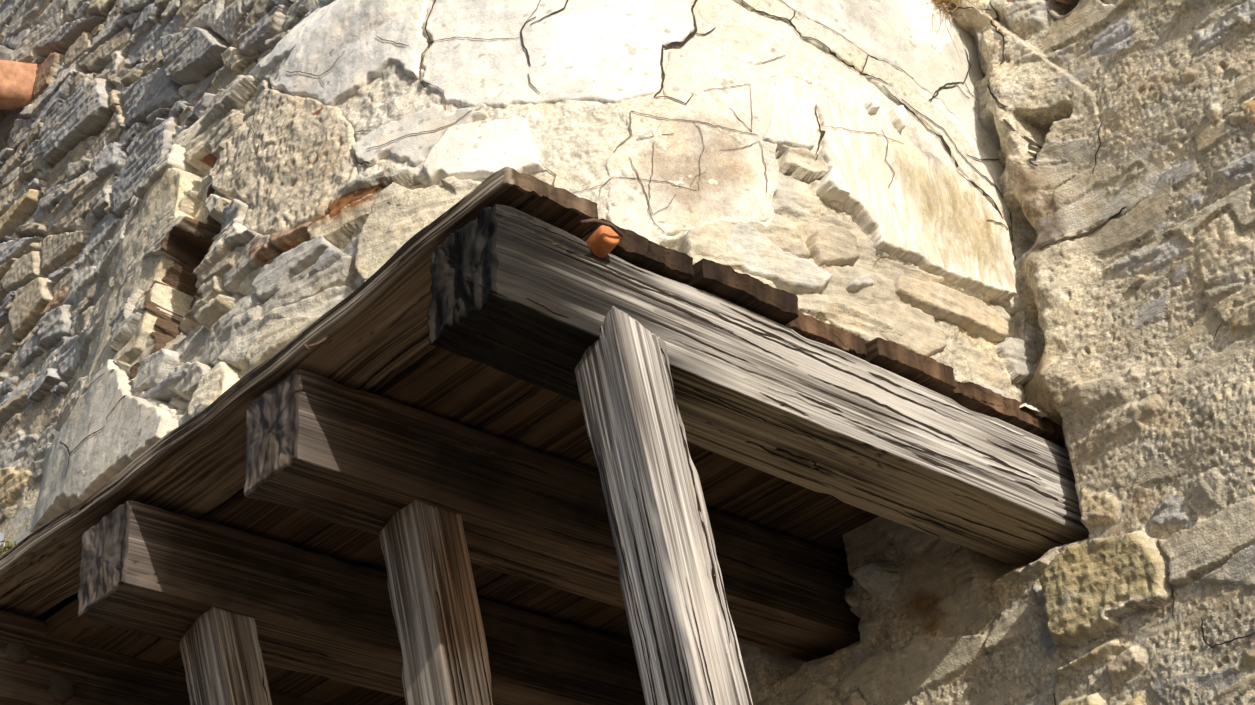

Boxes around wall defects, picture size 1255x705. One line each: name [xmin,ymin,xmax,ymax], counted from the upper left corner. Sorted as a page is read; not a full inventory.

crack [286,56,340,86]
crack [352,0,568,165]
crack [539,0,1126,261]
spalling [30,0,1037,534]
crack [59,374,138,477]